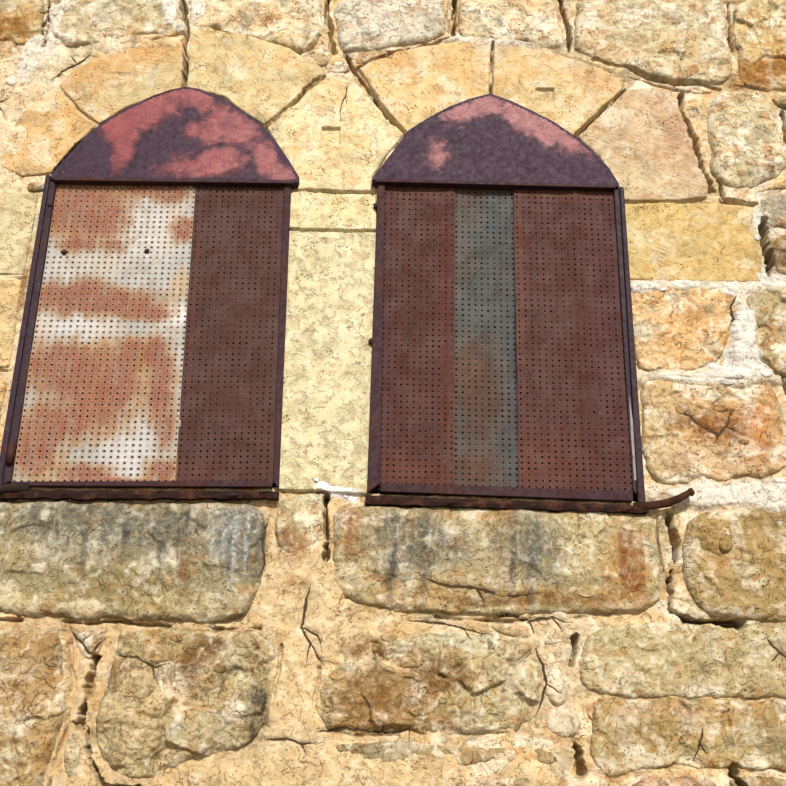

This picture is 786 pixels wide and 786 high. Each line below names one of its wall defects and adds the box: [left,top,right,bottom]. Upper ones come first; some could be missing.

corrosion [50,184,189,252]
corrosion [169,216,193,244]
corrosion [38,278,176,322]
corrosion [15,334,179,481]
crack [300,584,324,667]